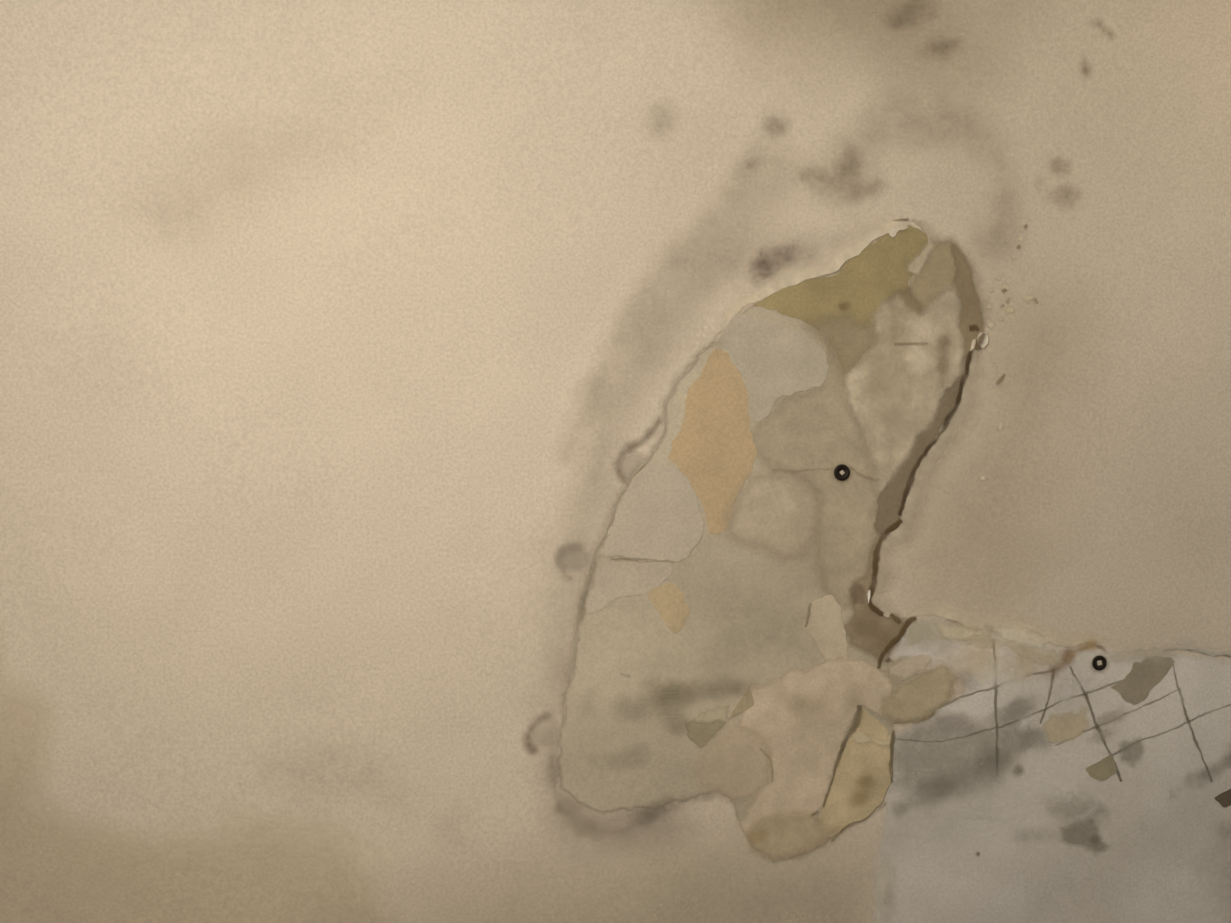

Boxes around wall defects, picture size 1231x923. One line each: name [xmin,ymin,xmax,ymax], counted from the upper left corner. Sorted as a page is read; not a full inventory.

peeling [558,219,1231,923]
crack [868,325,985,668]
crack [937,640,1148,782]
crack [1175,674,1212,782]